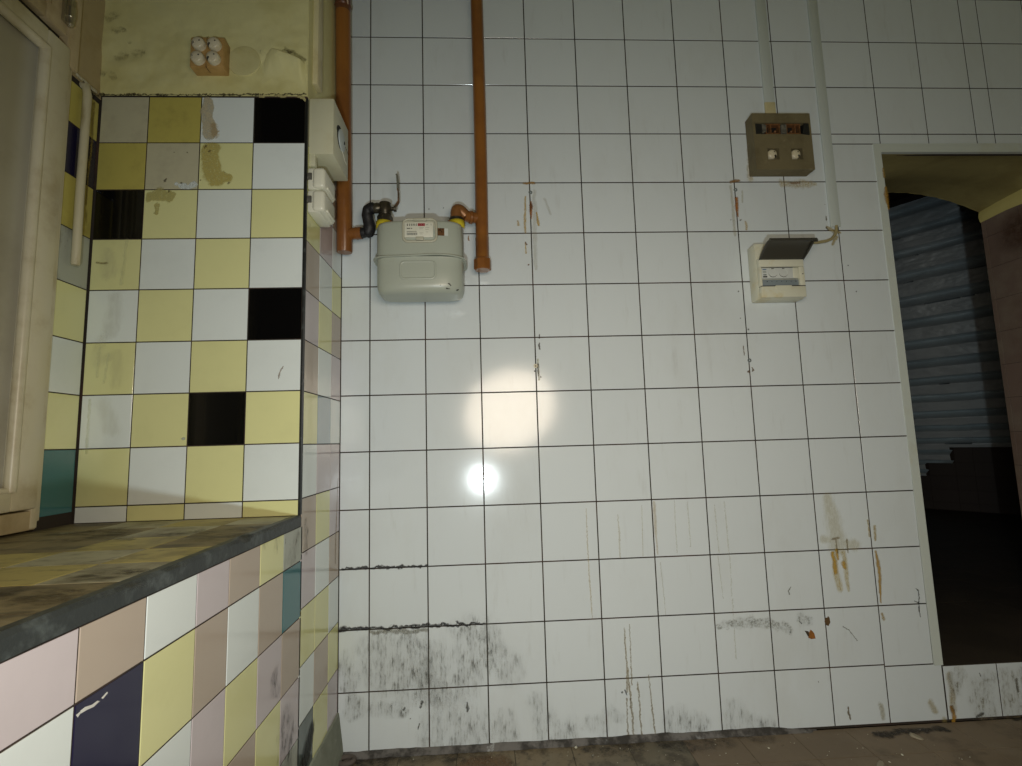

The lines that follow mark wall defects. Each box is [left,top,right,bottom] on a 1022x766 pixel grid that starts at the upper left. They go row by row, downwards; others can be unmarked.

peeling [146,97,232,215]
corrosion [867,520,884,619]
water stain [338,621,485,635]